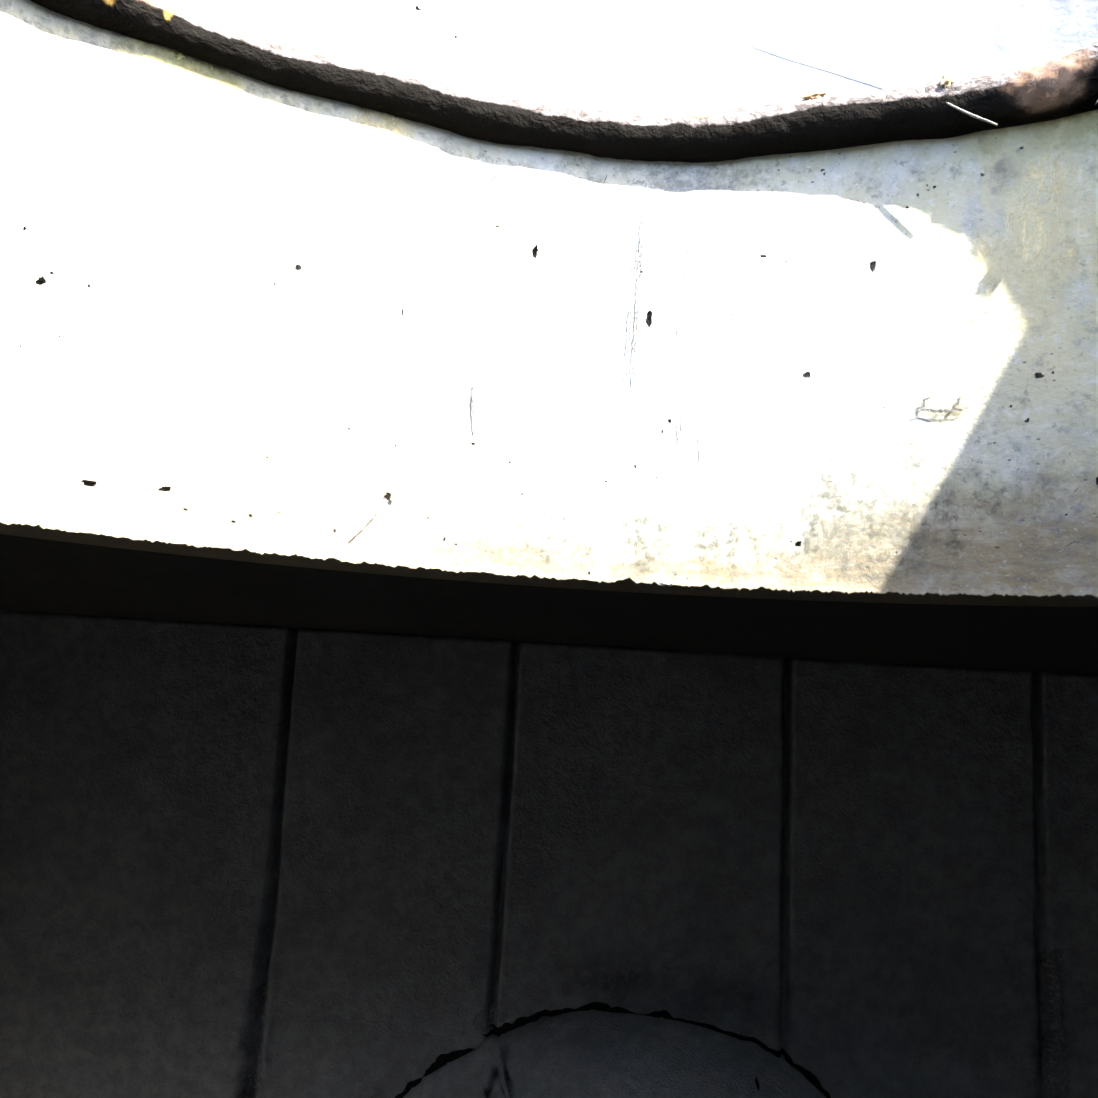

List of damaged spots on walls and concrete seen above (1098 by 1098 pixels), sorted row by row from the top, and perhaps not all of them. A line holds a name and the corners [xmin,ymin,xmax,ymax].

rust [1015,54,1088,110]
crack [395,1002,831,1098]